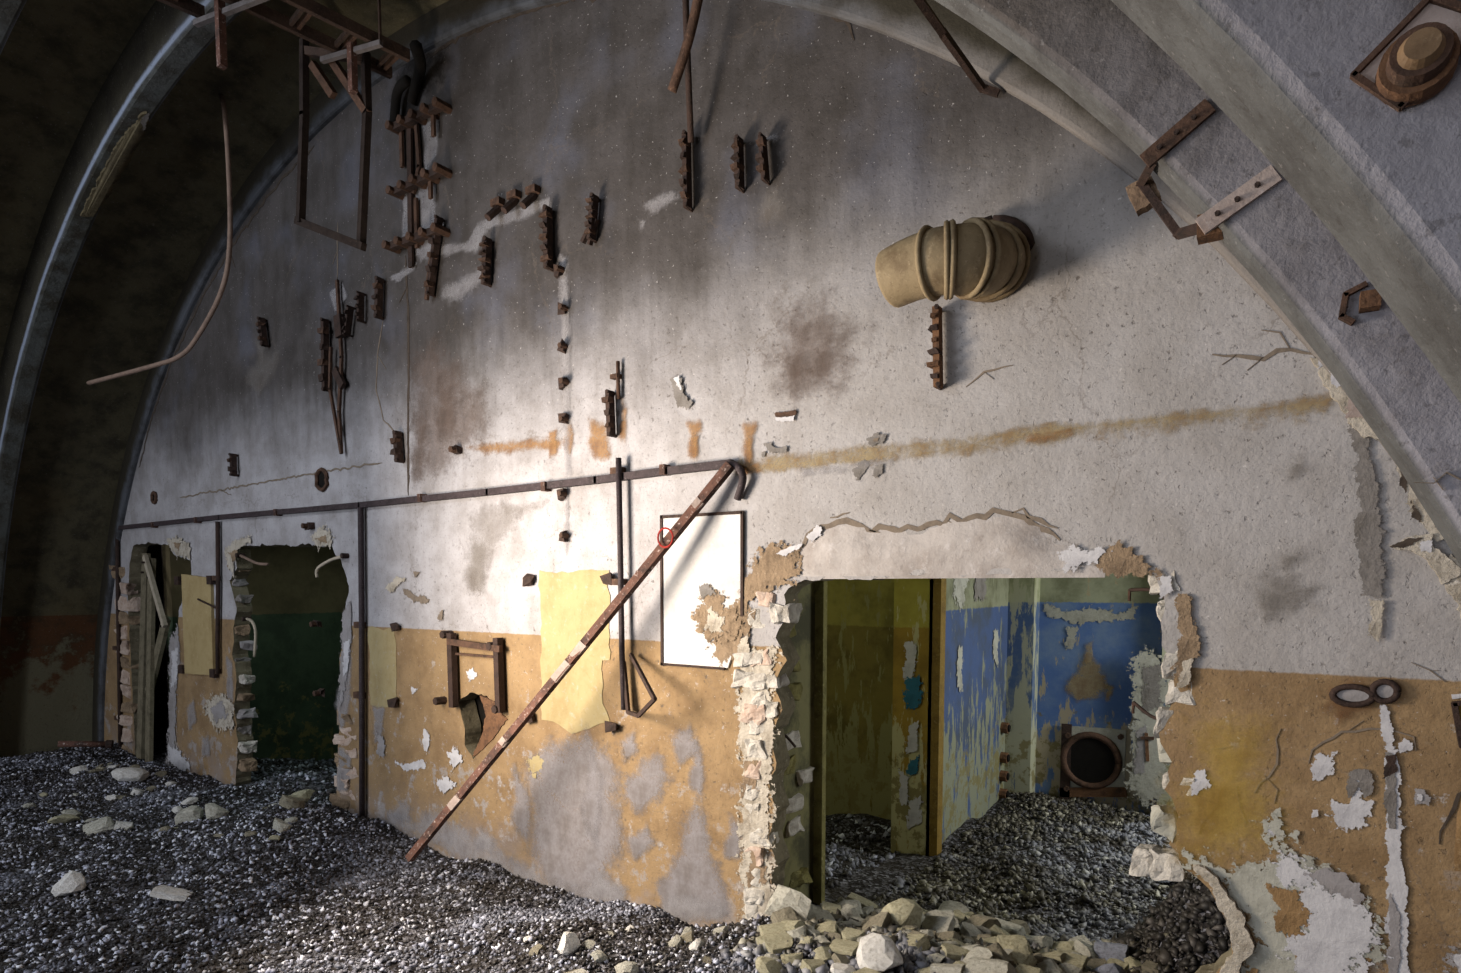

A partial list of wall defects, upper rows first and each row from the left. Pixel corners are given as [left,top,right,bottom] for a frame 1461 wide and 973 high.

crack [1212,330,1312,371]
rust [479,409,626,458]
rust [686,422,701,458]
rust [735,409,1231,476]
rust [1249,396,1332,420]
spalling [1310,357,1461,642]
spalling [329,600,359,809]
peeling [376,729,463,794]
spalling [466,668,487,735]
spalling [691,525,822,922]
peeling [898,640,928,829]
peeling [1043,539,1431,973]